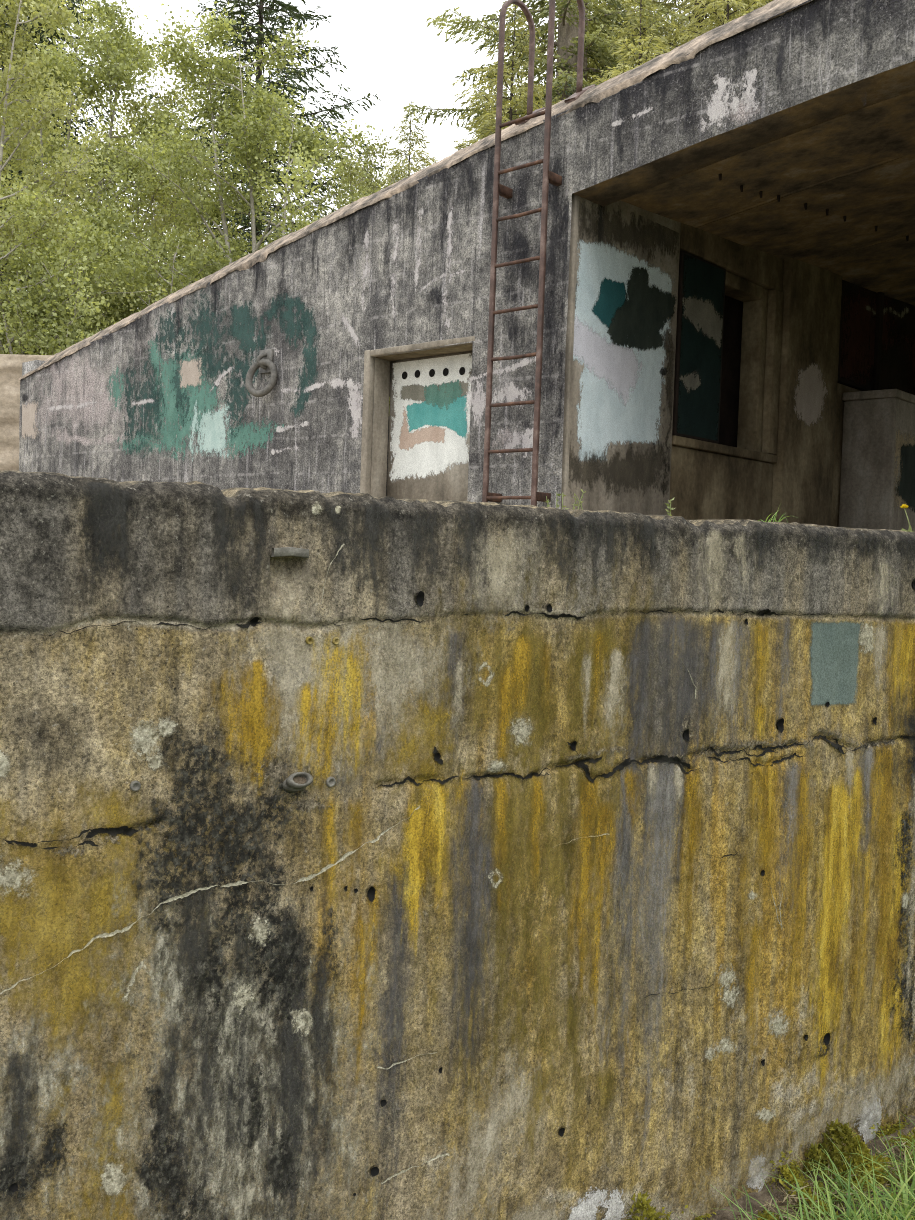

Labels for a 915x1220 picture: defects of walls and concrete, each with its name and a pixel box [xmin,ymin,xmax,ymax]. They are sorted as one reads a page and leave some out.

peeling [107,288,321,462]
damp [281,378,363,439]
damp [384,153,679,426]
damp [568,329,675,496]
peeling [573,240,725,463]
damp [0,787,158,1051]
damp [82,801,339,1220]
crack [377,1052,437,1069]
crack [381,1153,449,1184]
crack [0,658,915,994]
damp [212,496,749,1220]
spalling [568,1186,632,1220]